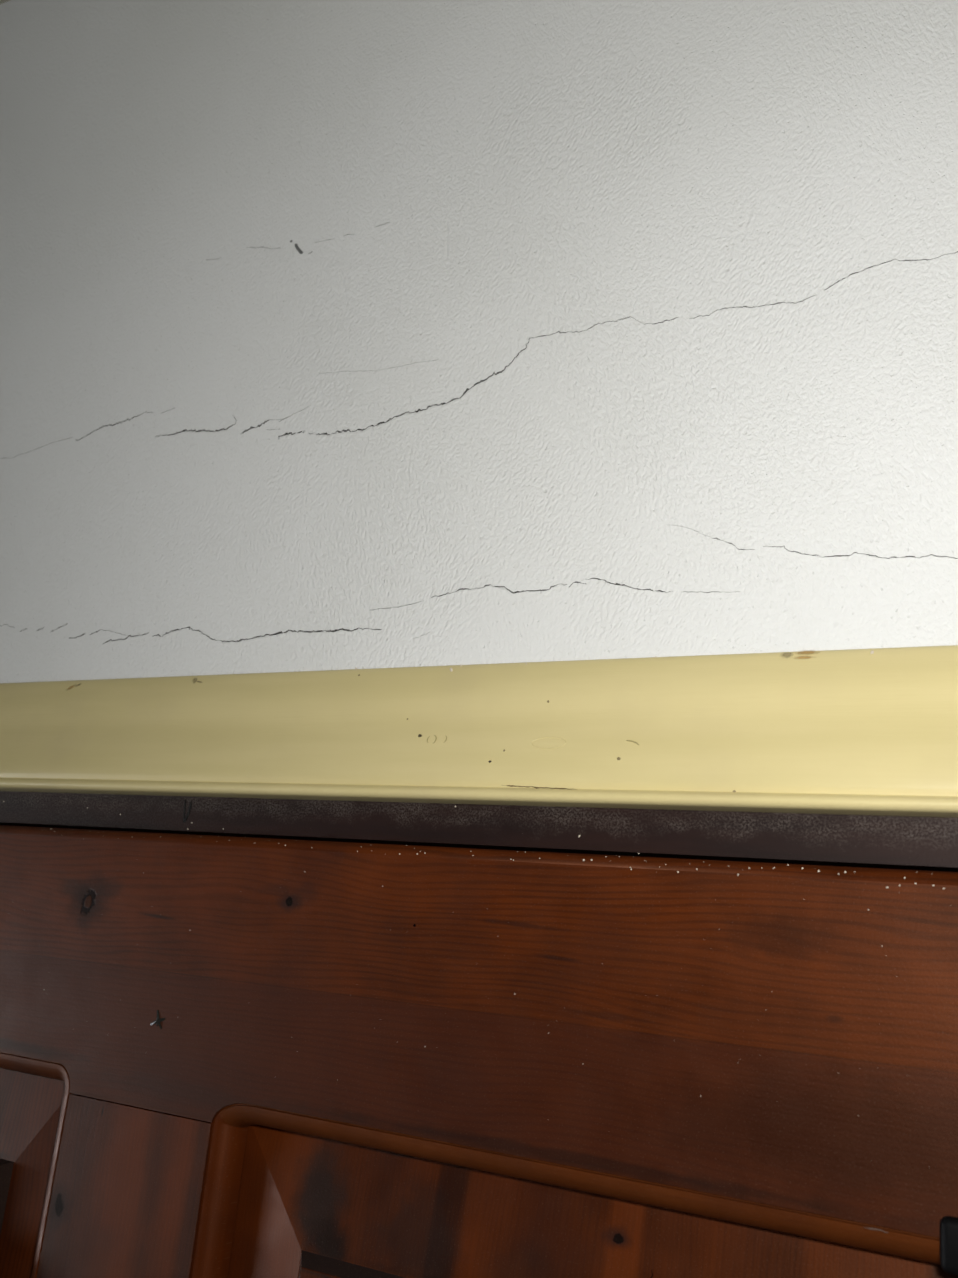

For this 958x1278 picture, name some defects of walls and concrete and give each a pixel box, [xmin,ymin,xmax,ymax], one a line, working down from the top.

crack [0,251,958,459]
crack [675,525,958,561]
crack [2,578,738,646]